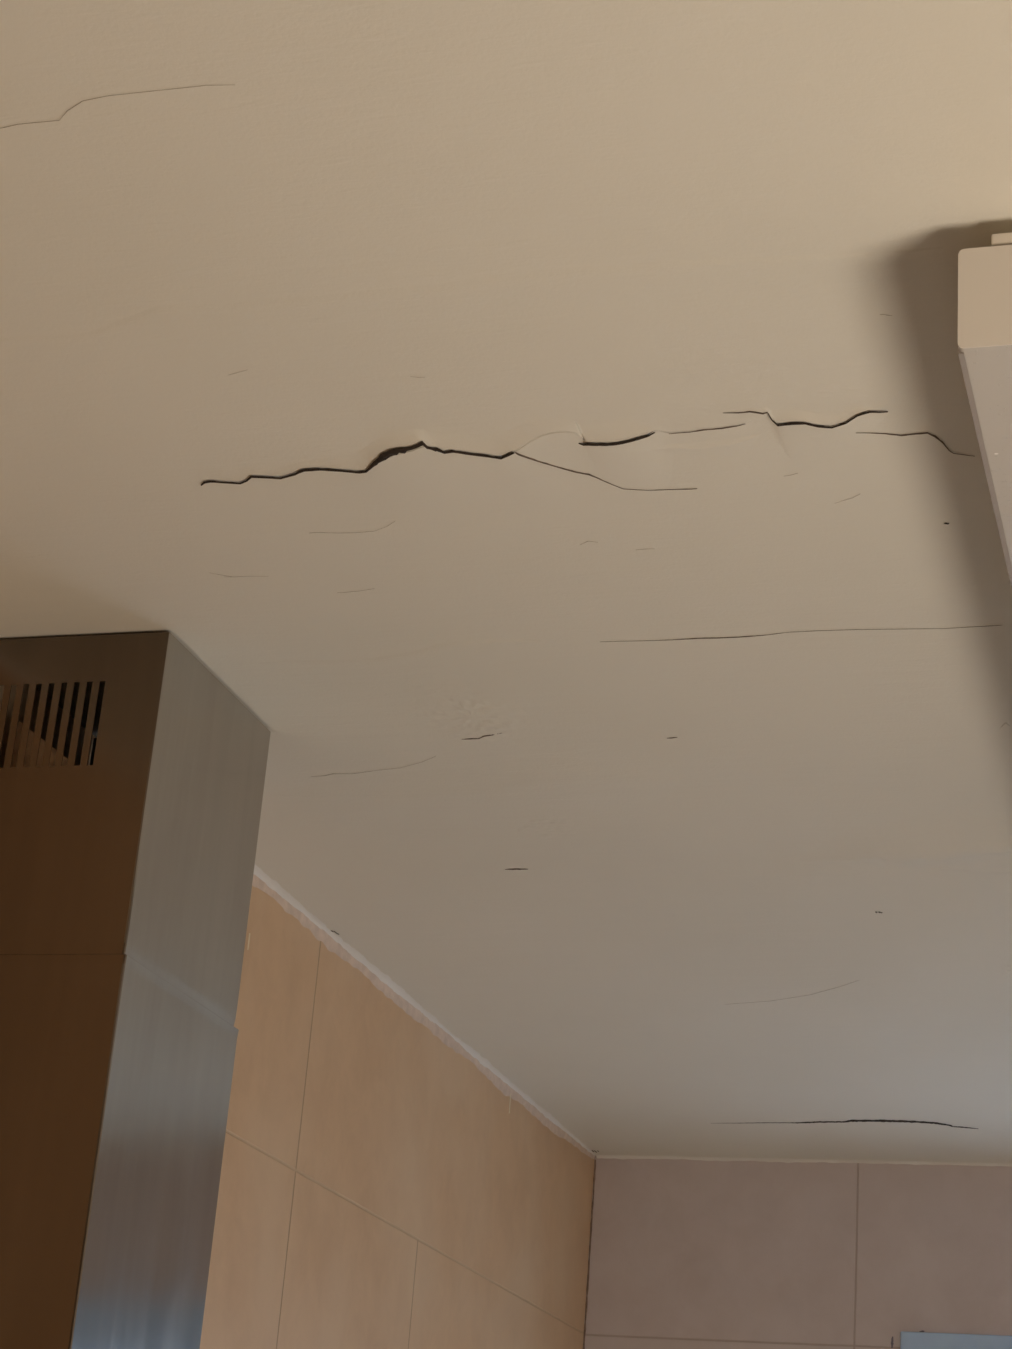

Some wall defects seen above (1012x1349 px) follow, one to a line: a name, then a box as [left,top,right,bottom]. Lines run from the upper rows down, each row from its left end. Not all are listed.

crack [0,84,235,136]
crack [600,624,1003,644]
crack [763,1119,978,1129]